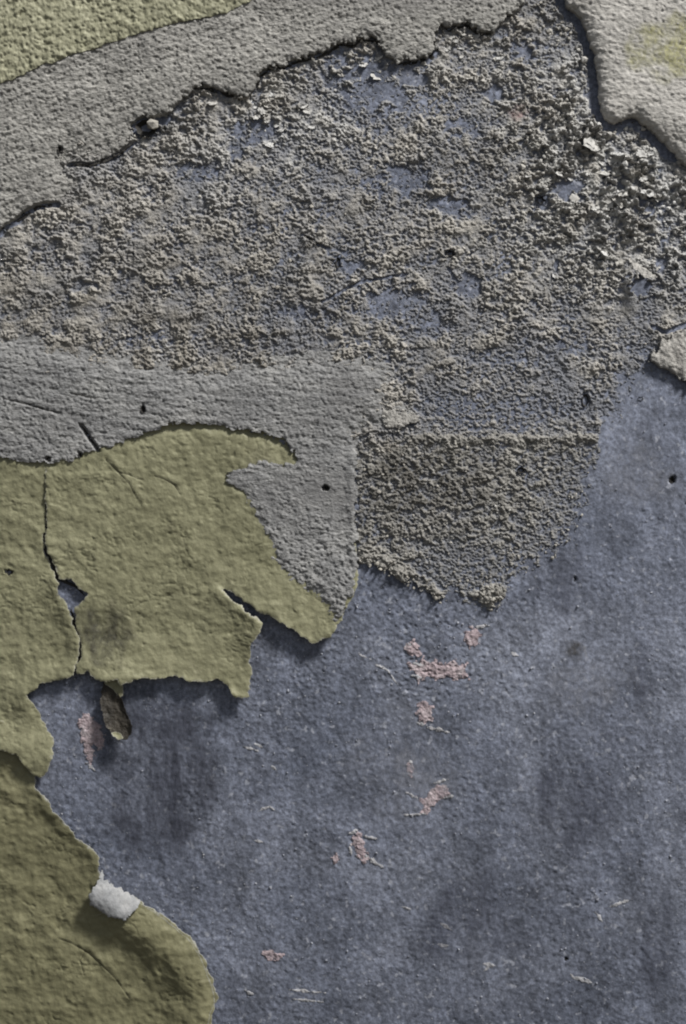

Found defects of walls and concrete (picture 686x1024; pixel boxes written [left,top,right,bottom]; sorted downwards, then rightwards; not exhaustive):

crack [398,24,491,66]
crack [200,39,378,101]
crack [69,142,134,167]
crack [2,204,53,234]
flaking render [0,0,686,740]
crack [43,504,84,675]
peeling [0,456,219,1024]
peeling [404,778,454,817]
peeling [331,829,384,868]
peeling [262,950,285,962]